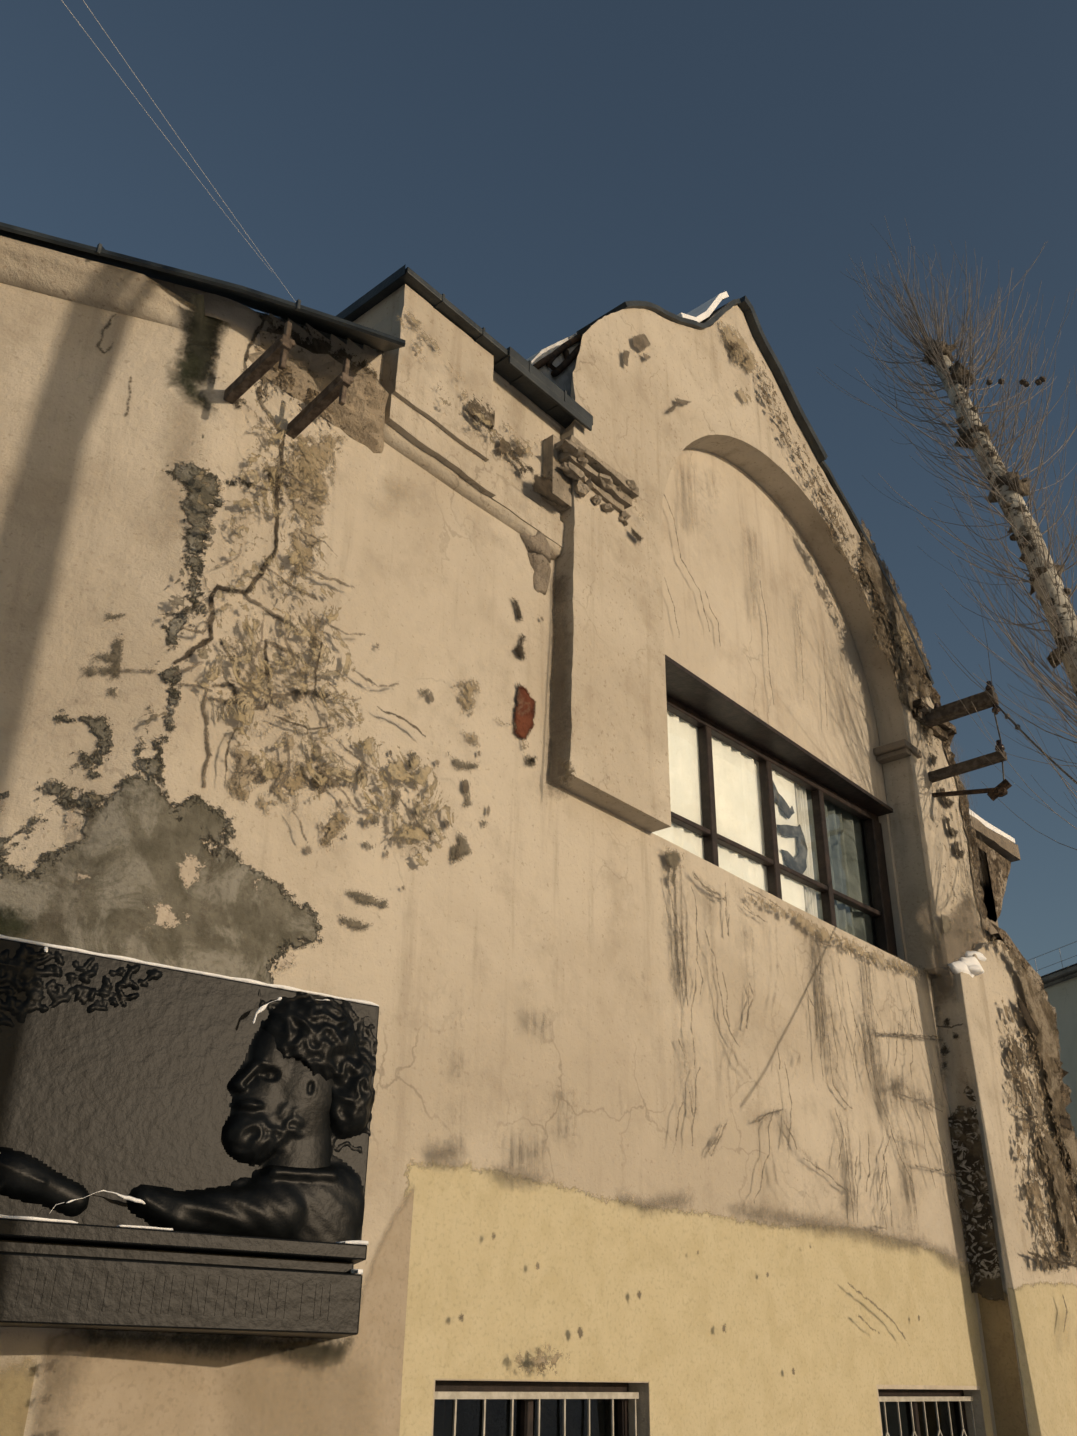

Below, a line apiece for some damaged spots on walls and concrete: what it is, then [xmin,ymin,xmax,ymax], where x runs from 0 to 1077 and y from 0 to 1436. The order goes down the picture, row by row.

water stain [184,291,227,383]
flaking render [256,310,383,383]
water stain [0,911,28,937]
flaking render [0,360,490,984]
crack [168,319,426,843]
crack [667,869,969,1243]
flaking render [719,321,1077,1301]